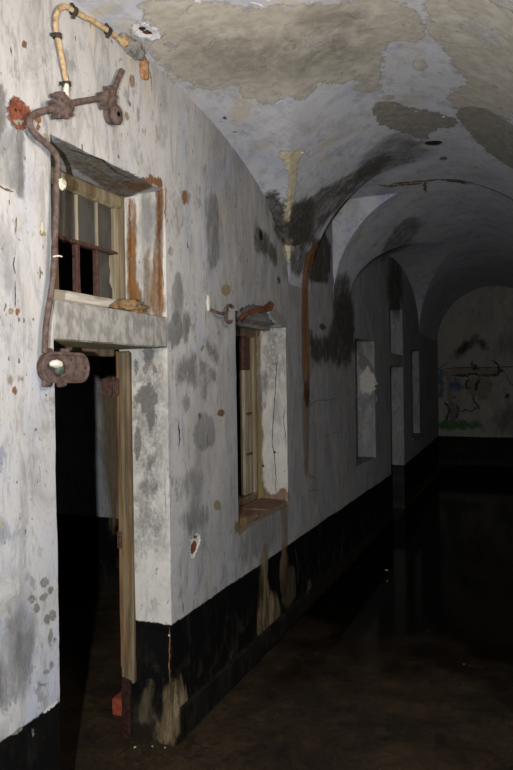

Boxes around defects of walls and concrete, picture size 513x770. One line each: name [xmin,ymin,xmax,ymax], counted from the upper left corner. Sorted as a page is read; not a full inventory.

peeling [118,0,513,168]
rust [34,116,167,316]
peeling [279,149,305,224]
water stain [255,140,418,365]
crack [368,179,513,201]
rust [302,244,318,477]